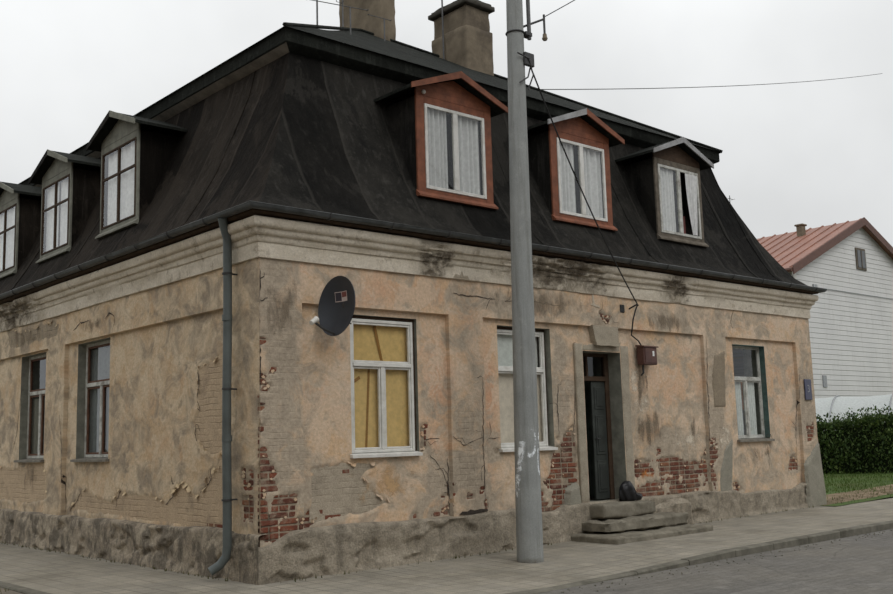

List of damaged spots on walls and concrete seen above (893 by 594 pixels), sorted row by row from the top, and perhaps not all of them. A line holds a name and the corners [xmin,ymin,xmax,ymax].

water stain [422,251,455,276]
flaking render [258,367,277,411]
peeling [69,354,223,528]
peeling [242,424,390,547]
flaking render [433,480,488,516]
crack [425,376,499,515]
flaking render [541,425,577,512]
flaking render [634,437,718,496]
flaking render [788,454,798,471]